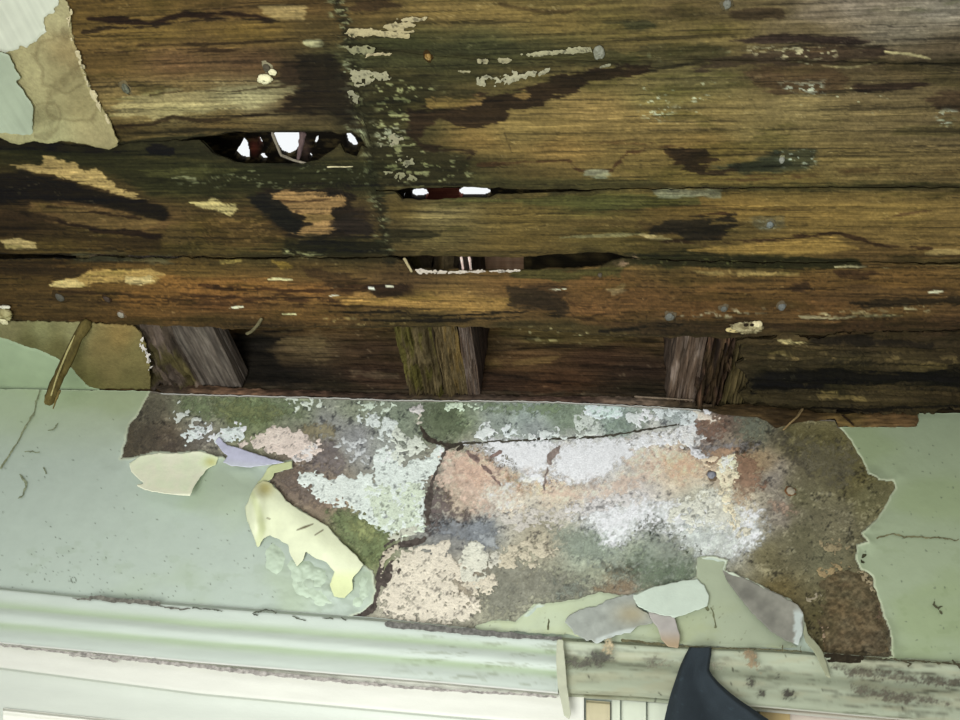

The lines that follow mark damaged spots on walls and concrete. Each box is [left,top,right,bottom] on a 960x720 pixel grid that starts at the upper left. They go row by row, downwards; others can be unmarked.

crack [252,424,679,621]
peeling [121,393,895,678]
damp [169,397,857,616]
crack [856,533,959,563]